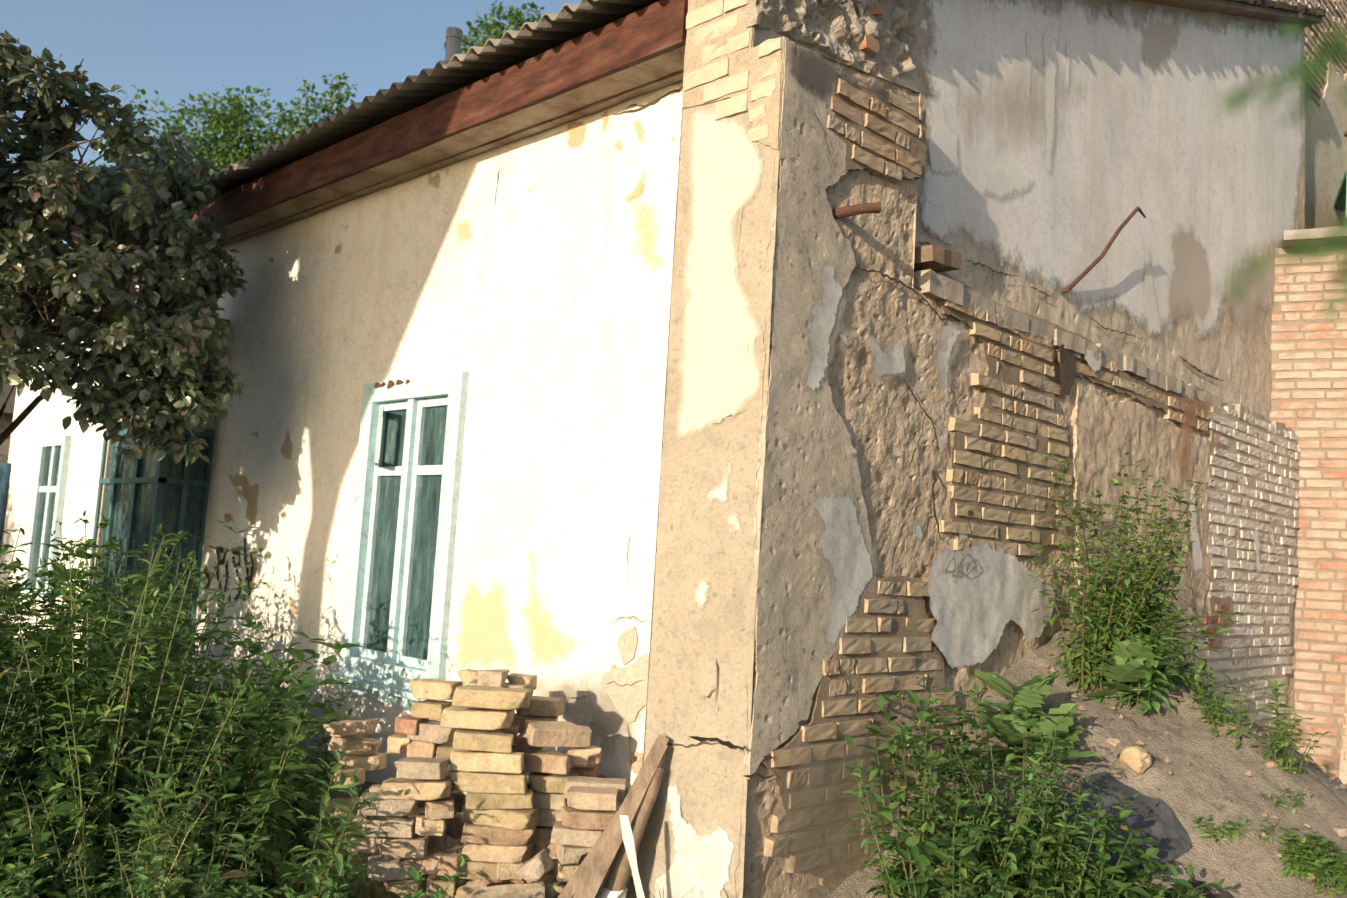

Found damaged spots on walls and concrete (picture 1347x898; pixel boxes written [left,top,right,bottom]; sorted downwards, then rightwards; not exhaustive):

spalling [683,0,924,184]
crack [852,243,972,328]
peeling [225,473,259,525]
spalling [939,300,1301,729]
crack [566,680,642,713]
spalling [768,581,962,825]
crack [667,736,776,780]
spalling [763,813,785,857]